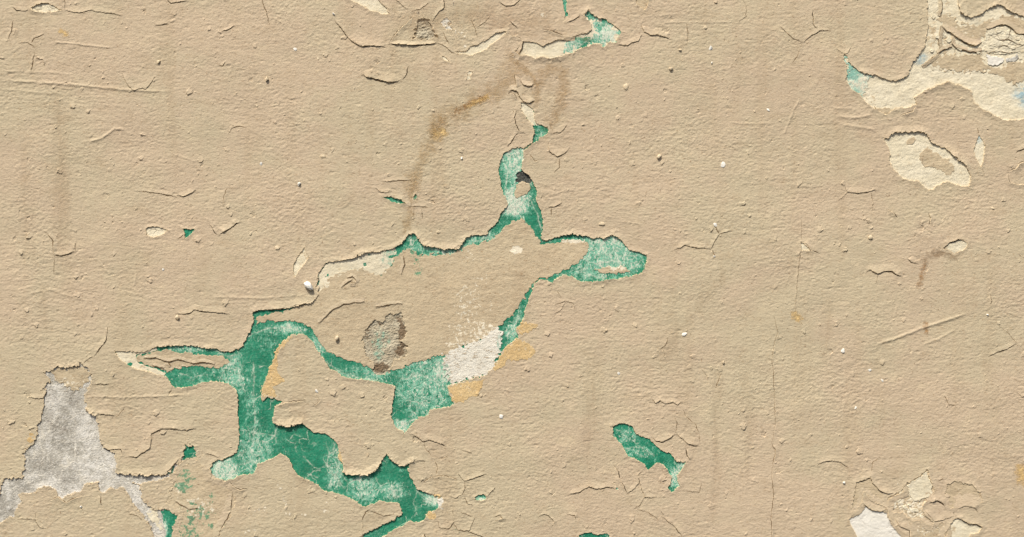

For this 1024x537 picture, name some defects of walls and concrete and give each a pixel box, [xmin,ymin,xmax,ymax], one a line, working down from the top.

peeling [439,0,626,82]
peeling [838,0,1024,196]
peeling [0,98,652,537]
peeling [608,419,691,496]
peeling [843,465,987,537]